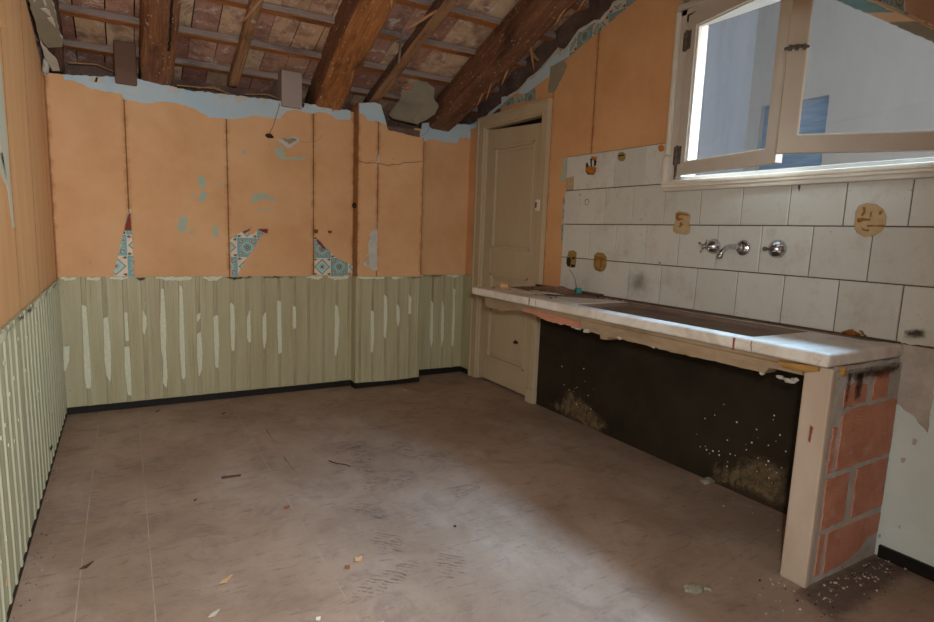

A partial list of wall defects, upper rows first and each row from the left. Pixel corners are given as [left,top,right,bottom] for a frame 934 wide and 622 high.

peeling [0,60,15,227]
peeling [82,305,91,389]
peeling [103,317,111,381]
peeling [124,312,132,396]
peeling [160,288,168,388]
peeling [262,301,296,354]
peeling [371,294,412,353]
peeling [430,288,456,347]